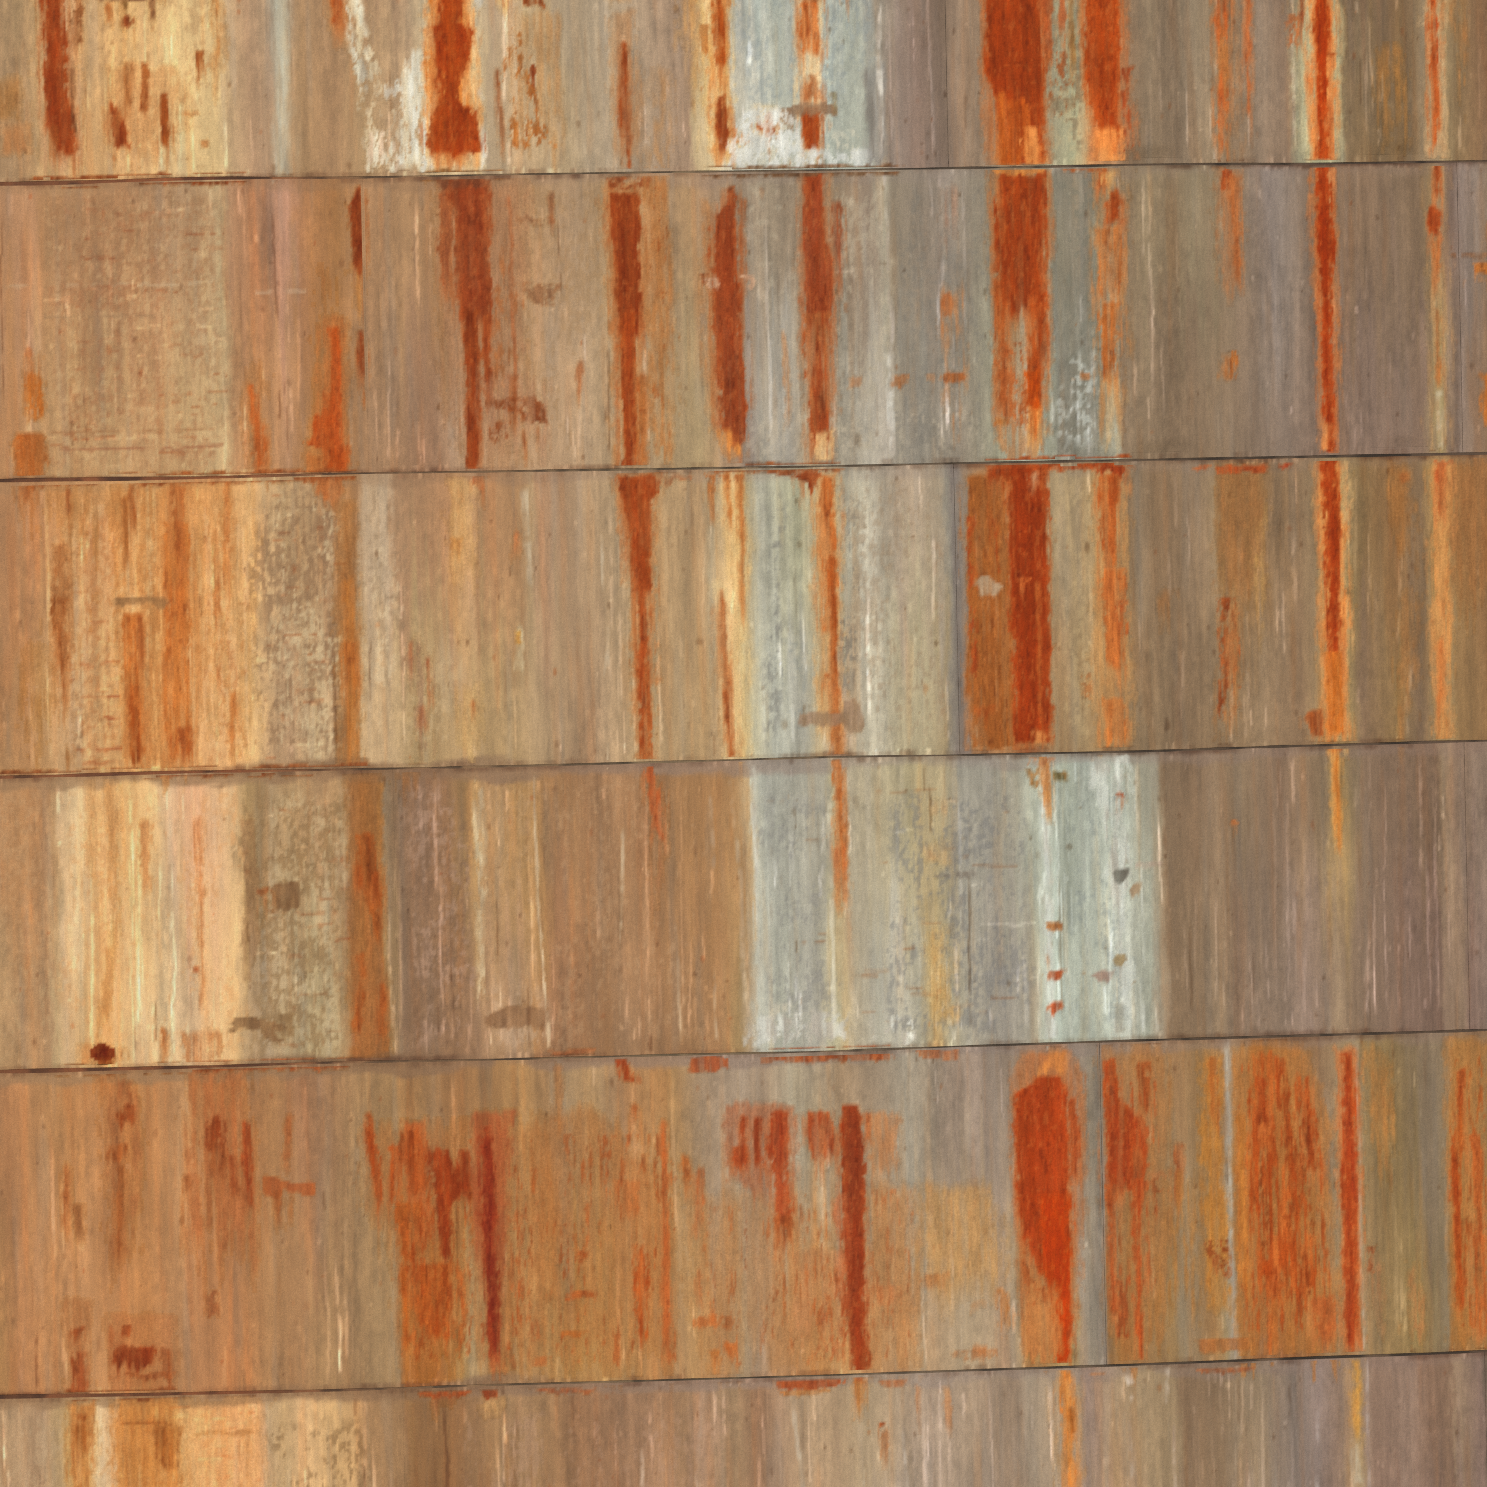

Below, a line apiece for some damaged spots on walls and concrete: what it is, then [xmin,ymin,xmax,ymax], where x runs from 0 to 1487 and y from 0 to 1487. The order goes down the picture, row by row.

rust [0,0,248,189]
rust [0,184,486,1487]
rust [416,0,568,596]
rust [573,357,586,409]
rust [594,0,906,931]
rust [895,0,1143,826]
rust [1191,0,1358,860]
rust [354,1035,1487,1487]